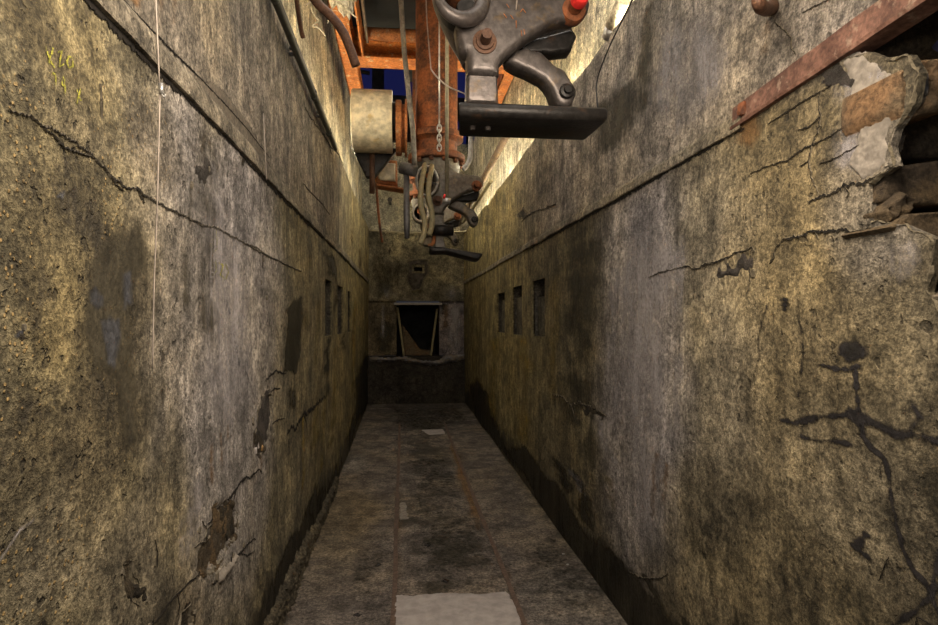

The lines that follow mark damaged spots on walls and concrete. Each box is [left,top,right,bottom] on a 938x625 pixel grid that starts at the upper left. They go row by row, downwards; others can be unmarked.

spalling [822,64,855,90]
crack [85,0,368,284]
crack [750,86,897,203]
crack [9,109,302,272]
crack [530,127,744,249]
spalling [717,253,756,278]
crack [650,227,870,294]
crack [266,369,286,392]
peeling [252,386,275,459]
crack [273,393,327,447]
spalling [196,500,245,581]
spalling [178,602,197,625]